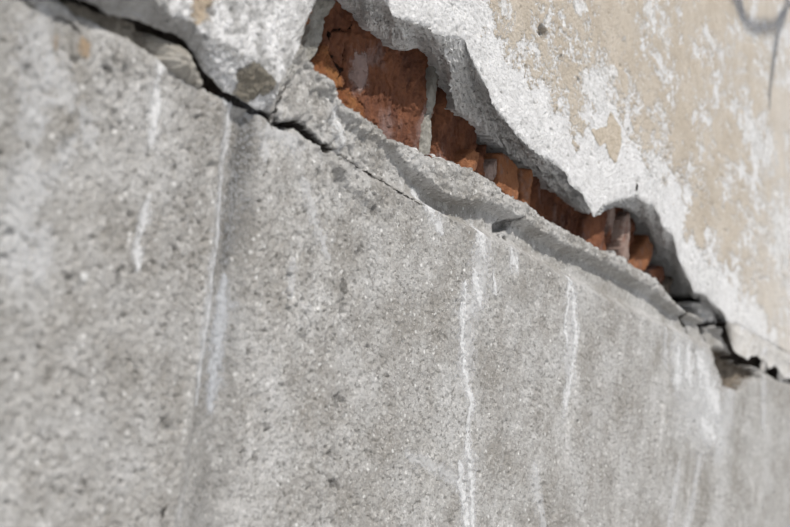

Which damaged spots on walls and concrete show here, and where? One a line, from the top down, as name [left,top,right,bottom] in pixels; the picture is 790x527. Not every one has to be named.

crack [326,24,366,109]
crack [249,84,423,205]
spalling [337,0,727,324]
damp [471,226,490,259]
damp [510,246,519,272]
damp [457,268,483,527]
damp [563,276,580,417]
crack [678,312,717,333]